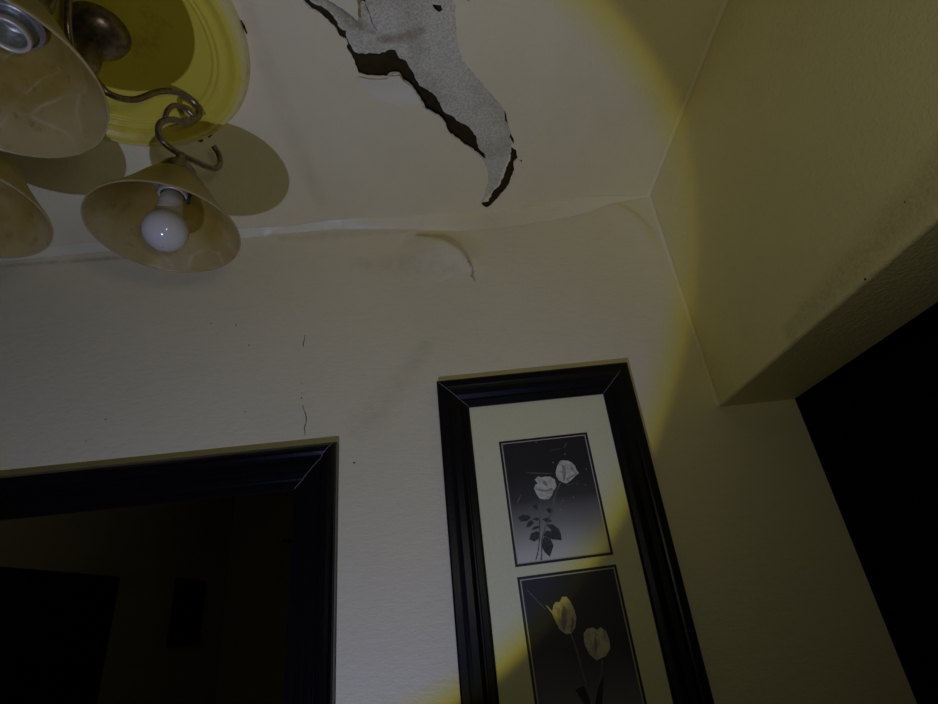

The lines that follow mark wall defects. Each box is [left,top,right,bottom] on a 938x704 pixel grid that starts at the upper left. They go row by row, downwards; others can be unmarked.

flaking render [304,0,523,201]